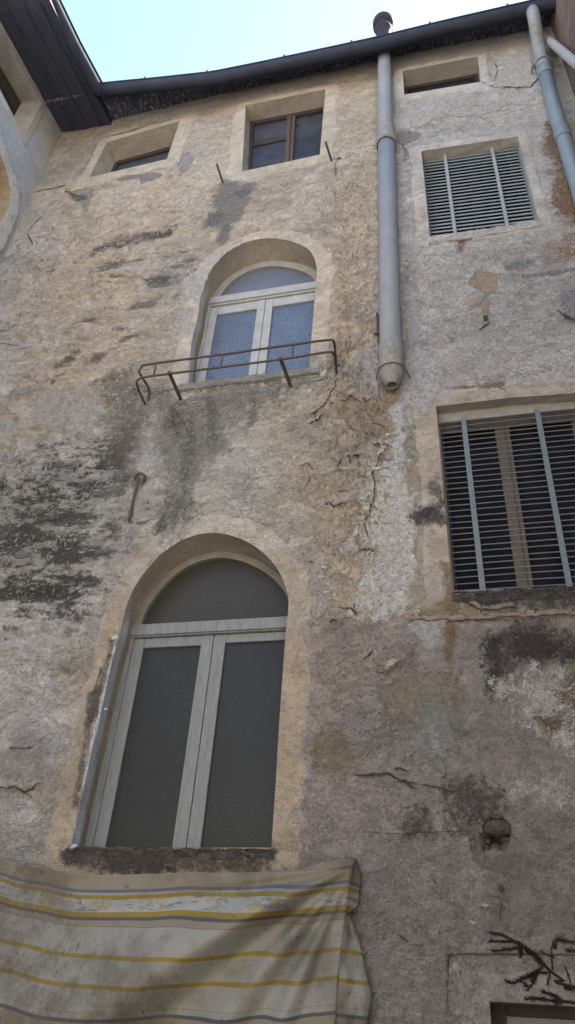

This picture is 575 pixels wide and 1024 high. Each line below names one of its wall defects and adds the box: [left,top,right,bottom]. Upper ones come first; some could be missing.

crack [481,62,538,88]
leakage [201,180,254,243]
crack [305,376,380,425]
leakage [0,363,340,639]
crack [298,437,394,555]
crack [329,603,367,623]
crack [397,599,575,623]
leakage [413,562,575,824]
crack [351,766,458,792]
leakage [60,846,277,874]